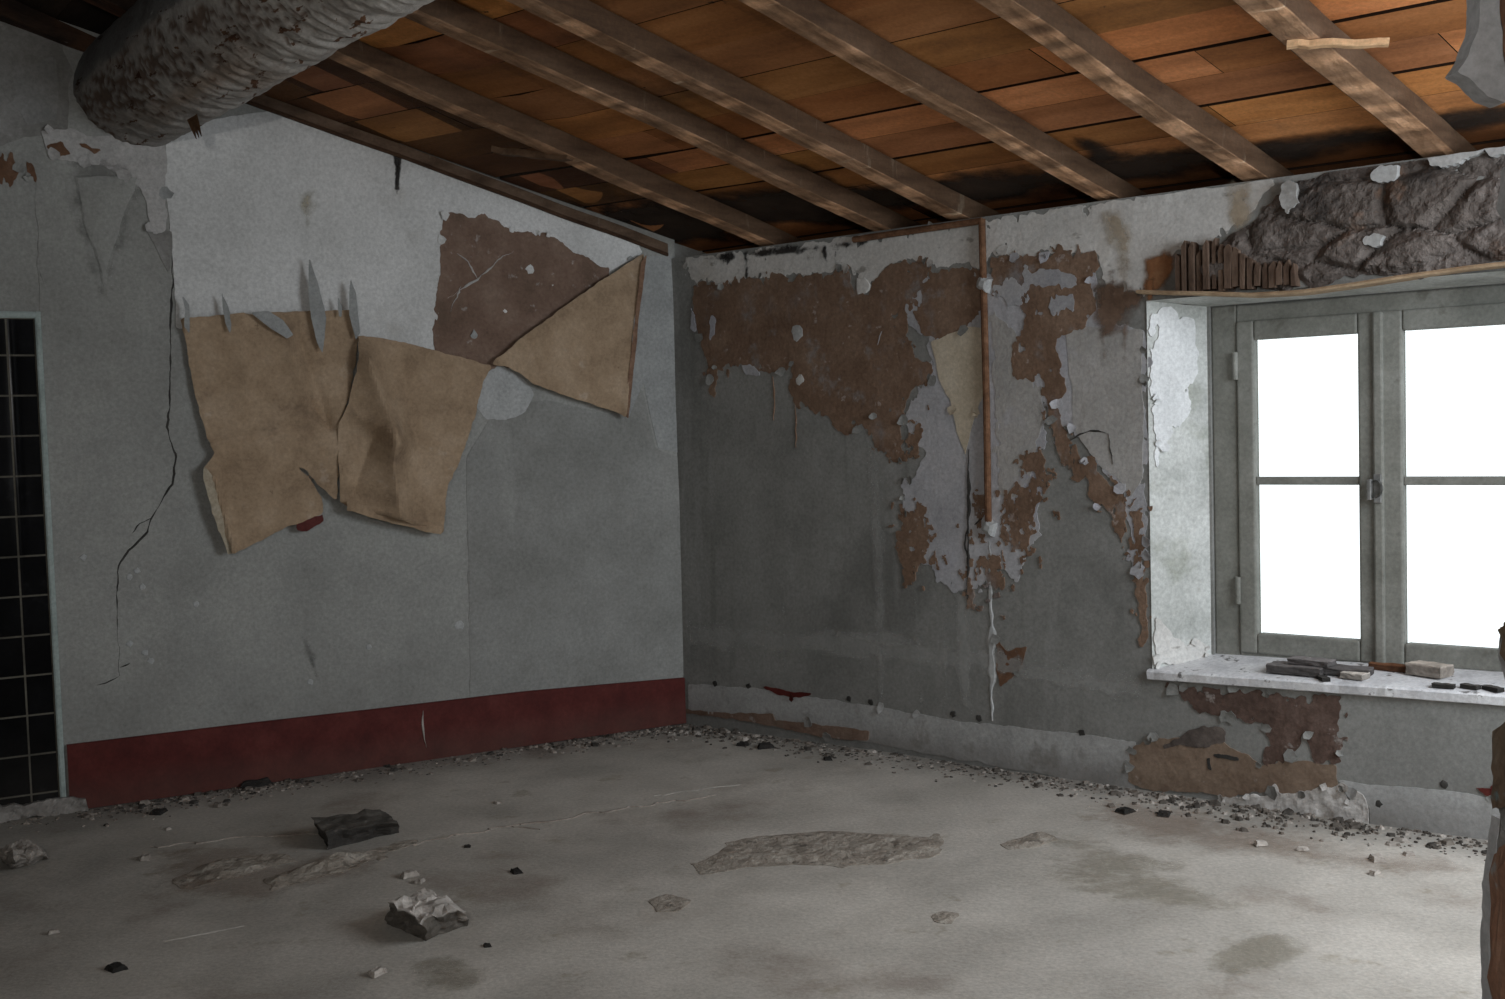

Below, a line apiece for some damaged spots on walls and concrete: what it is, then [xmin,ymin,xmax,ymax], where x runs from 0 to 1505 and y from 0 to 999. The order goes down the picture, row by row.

flaking render [0,23,101,187]
flaking render [1445,0,1505,108]
crack [99,224,177,685]
flaking render [145,111,1505,669]
peeling [990,615,1027,686]
flaking render [688,681,1500,999]